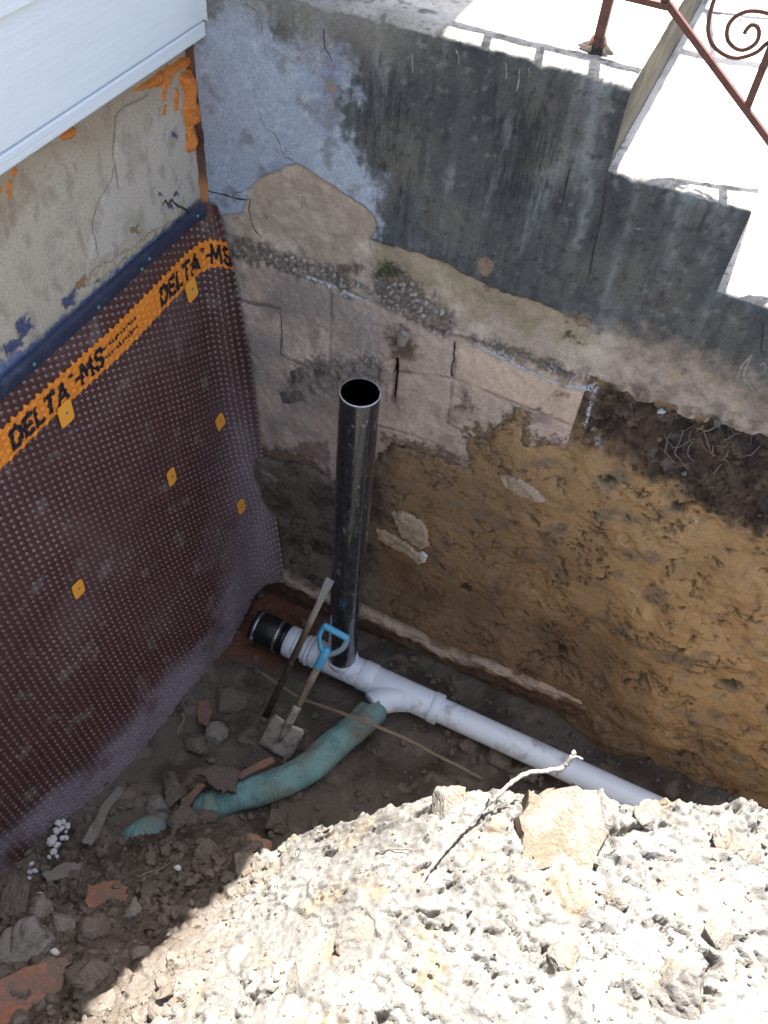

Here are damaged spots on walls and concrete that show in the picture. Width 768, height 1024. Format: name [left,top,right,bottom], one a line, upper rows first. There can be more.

crack [92,93,148,256]
crack [561,167,570,207]
crack [209,191,262,238]
crack [587,176,607,281]
spalling [468,251,502,277]
flaking render [279,351,390,404]
crack [438,341,456,378]